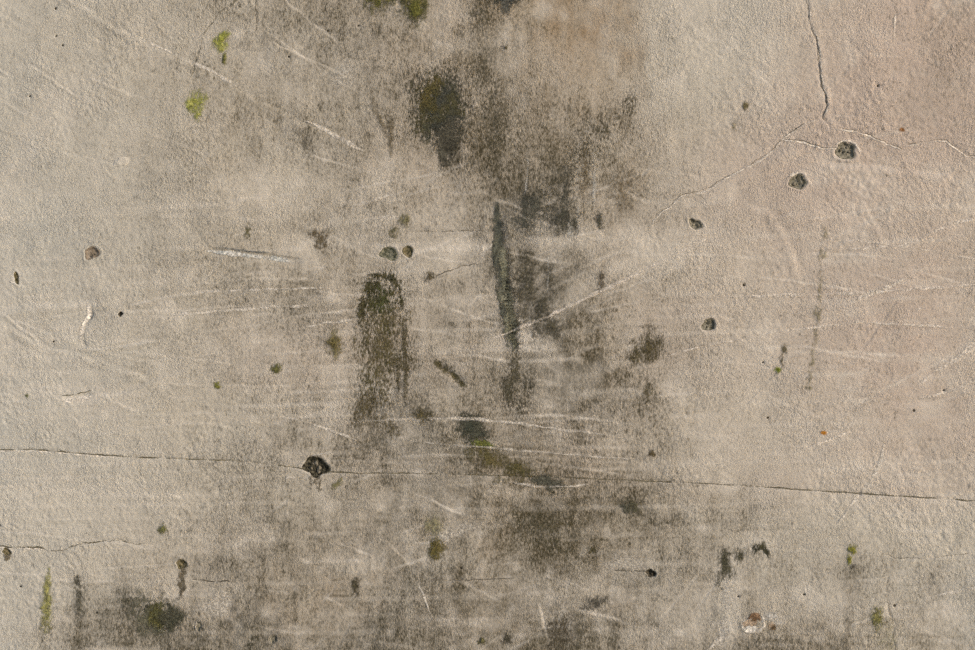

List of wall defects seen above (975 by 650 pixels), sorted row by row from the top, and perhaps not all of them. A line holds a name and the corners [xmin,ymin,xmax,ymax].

crack [648,0,975,230]
damp [396,320,409,397]
crack [0,449,230,461]
spalling [302,452,331,491]
crack [330,469,438,477]
crack [566,477,974,501]